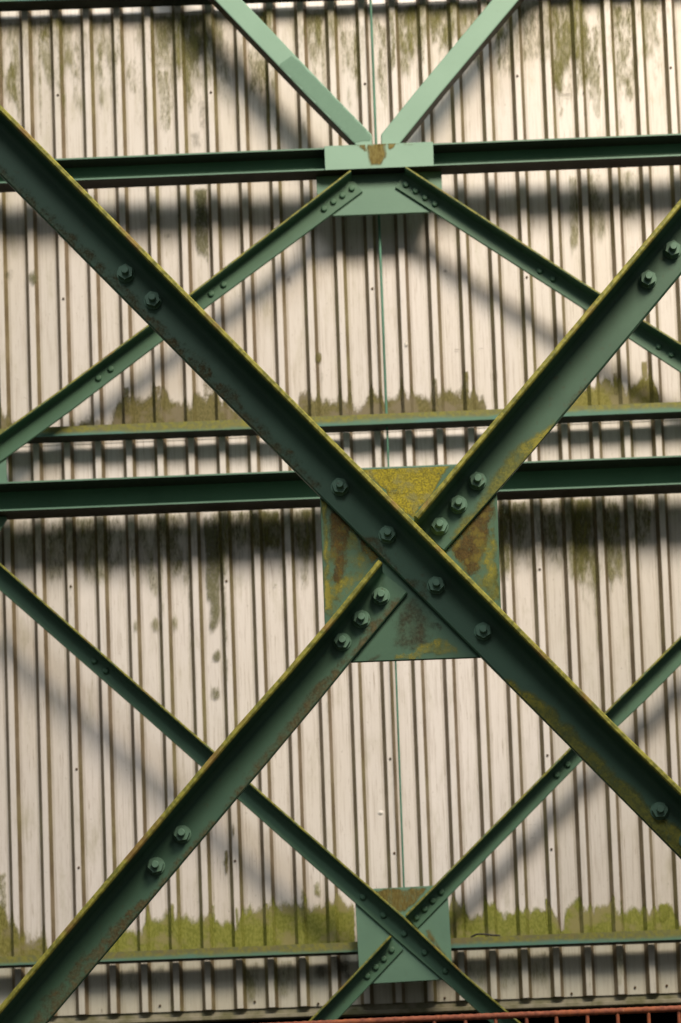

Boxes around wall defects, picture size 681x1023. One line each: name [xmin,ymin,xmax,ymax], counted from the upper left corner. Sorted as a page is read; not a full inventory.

rust [360,143,395,165]
rust [330,512,350,587]
rust [452,501,494,575]